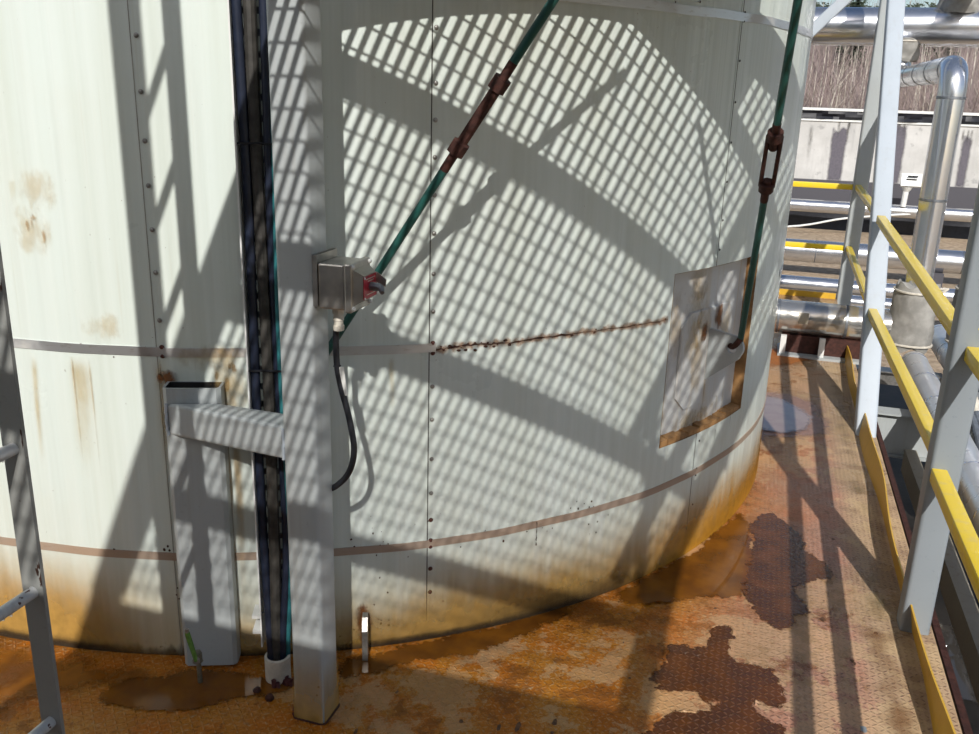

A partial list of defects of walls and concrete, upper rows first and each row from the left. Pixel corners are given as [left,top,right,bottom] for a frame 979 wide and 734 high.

corrosion [702,304,723,340]
leakage [760,392,829,439]
corrosion [651,445,760,573]
peeling [741,513,837,631]
peeling [640,624,793,734]